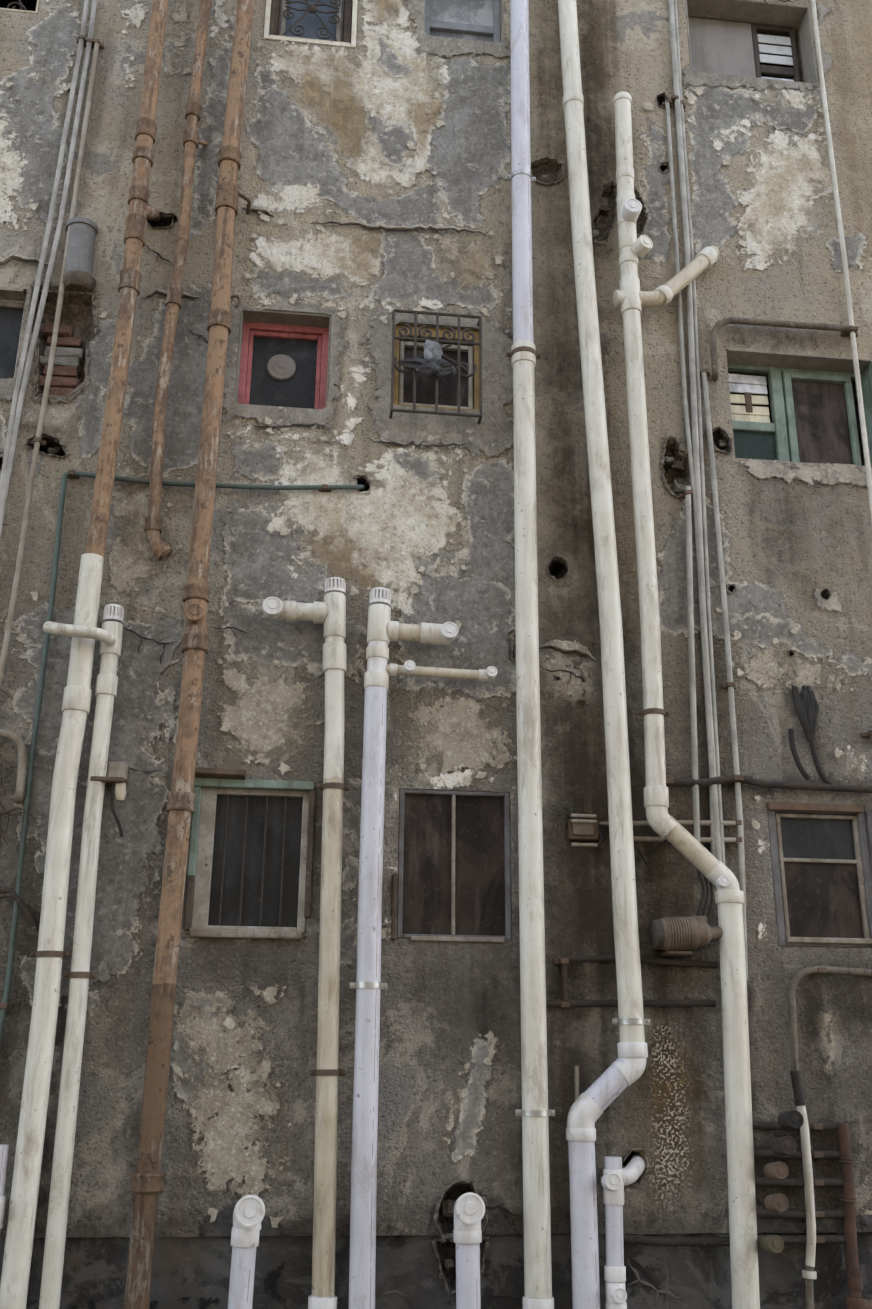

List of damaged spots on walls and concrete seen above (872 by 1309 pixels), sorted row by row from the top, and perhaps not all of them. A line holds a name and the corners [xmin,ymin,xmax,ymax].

crack [0,252,55,266]
peeling [24,281,117,464]
crack [242,204,274,218]
peeling [246,0,512,324]
crack [311,217,490,236]
peeling [87,278,212,1019]
peeling [217,358,517,807]
peeling [59,619,103,1008]
leakage [630,766,686,881]
leakage [672,811,694,837]
peeling [432,1031,498,1295]
leakage [645,950,708,1205]